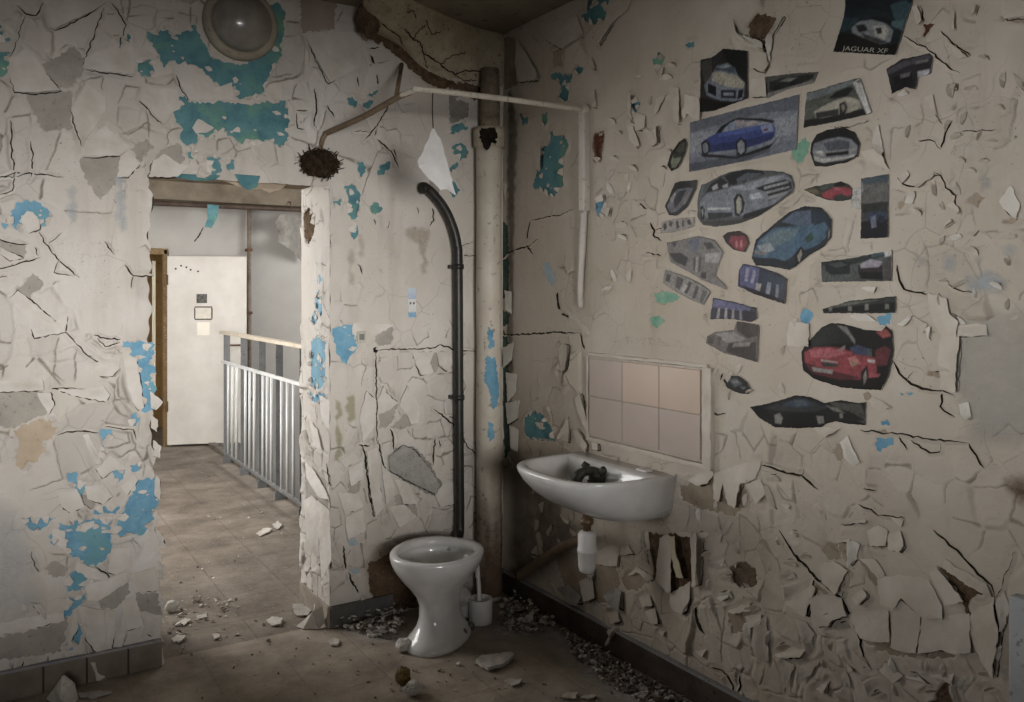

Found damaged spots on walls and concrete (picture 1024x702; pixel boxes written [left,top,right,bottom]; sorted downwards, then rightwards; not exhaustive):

peeling [0,274,166,660]
peeling [0,0,291,212]
peeling [307,276,394,450]
peeling [333,161,391,240]
peeling [303,385,455,580]
crack [358,342,476,517]
corrosion [592,131,604,162]
crack [894,265,977,297]
crack [896,120,996,211]
peeling [556,461,994,702]
crack [779,530,870,671]
crack [933,530,1017,678]